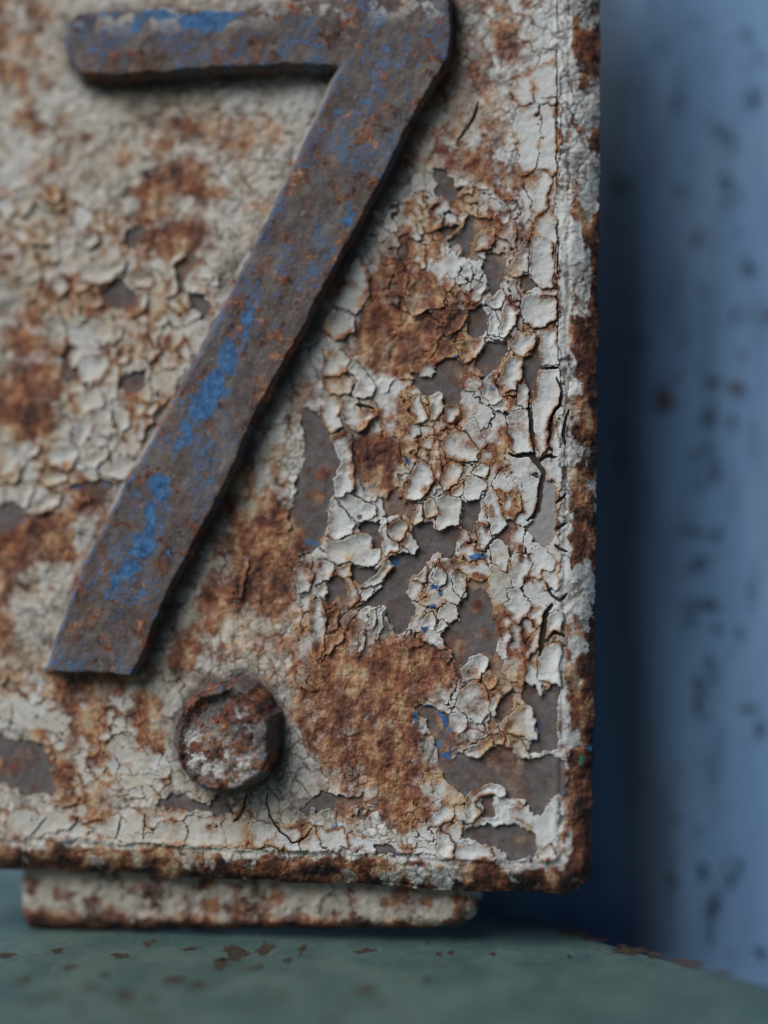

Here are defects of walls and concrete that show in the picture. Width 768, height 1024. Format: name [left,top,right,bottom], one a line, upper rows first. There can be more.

rust [571,0,600,91]
rust [21,130,95,184]
rust [111,103,278,256]
crack [542,0,559,195]
rust [565,109,601,170]
crack [554,224,562,327]
peeling [0,56,567,864]
crack [508,366,570,552]
rust [0,180,600,894]
crack [538,583,568,656]
crack [81,814,147,839]
crack [224,793,315,844]